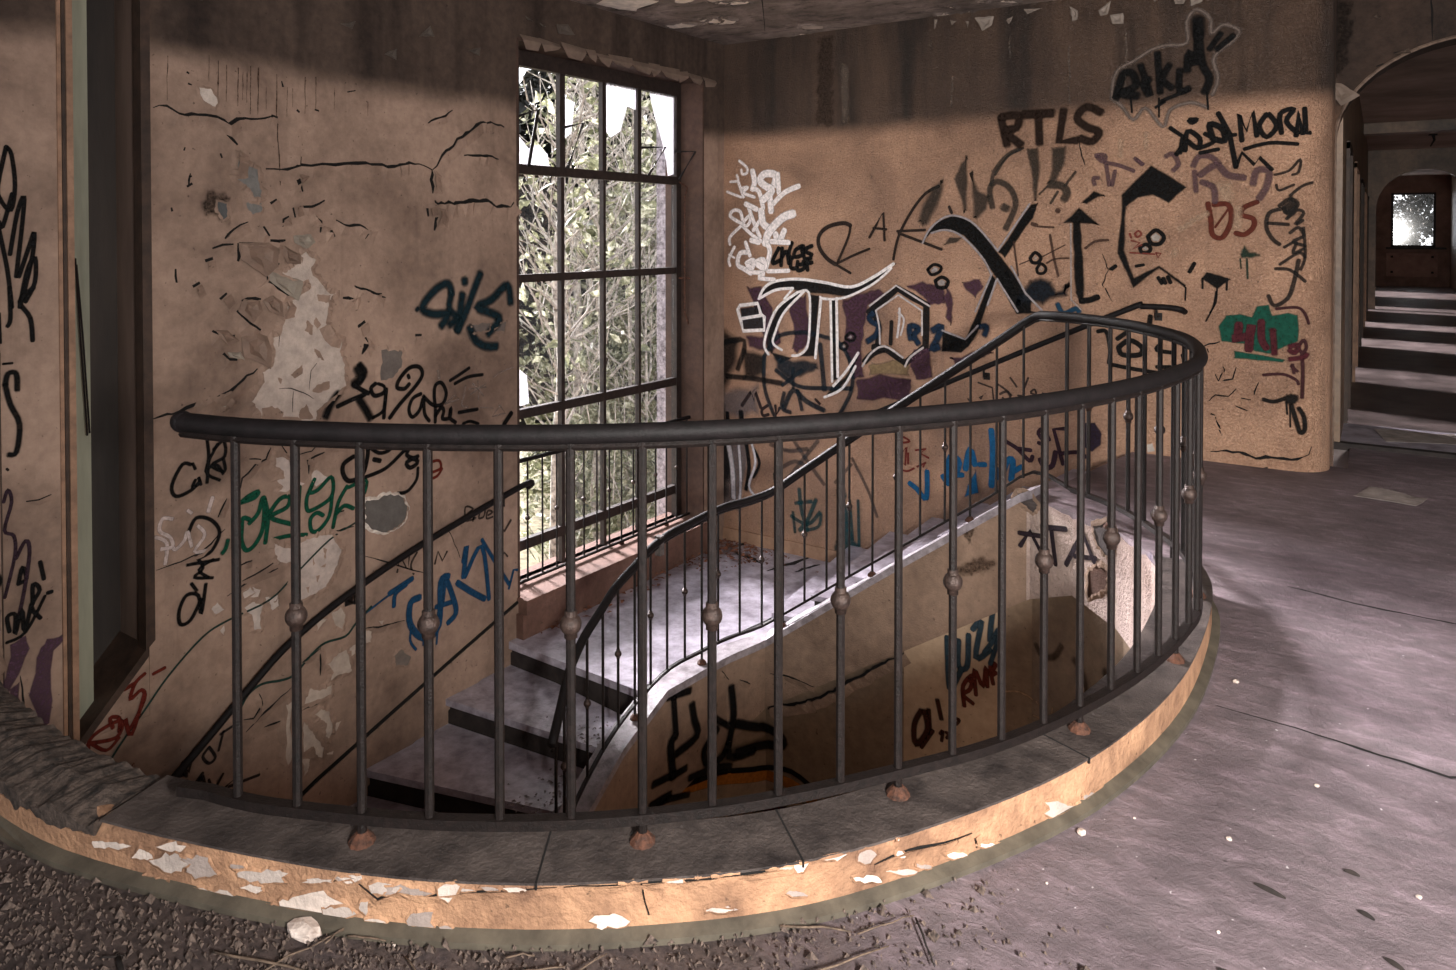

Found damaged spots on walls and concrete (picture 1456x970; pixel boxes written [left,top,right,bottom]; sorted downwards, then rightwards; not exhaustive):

peeling [590,0,754,30]
crack [153,71,522,431]
flaking render [215,242,350,421]
flaking render [365,491,410,535]
flaking render [1043,784,1104,819]
flaking render [91,837,528,929]
flaking render [618,872,740,888]
flaking render [765,837,1001,899]
flaking render [586,909,633,930]
flaking render [703,903,741,915]